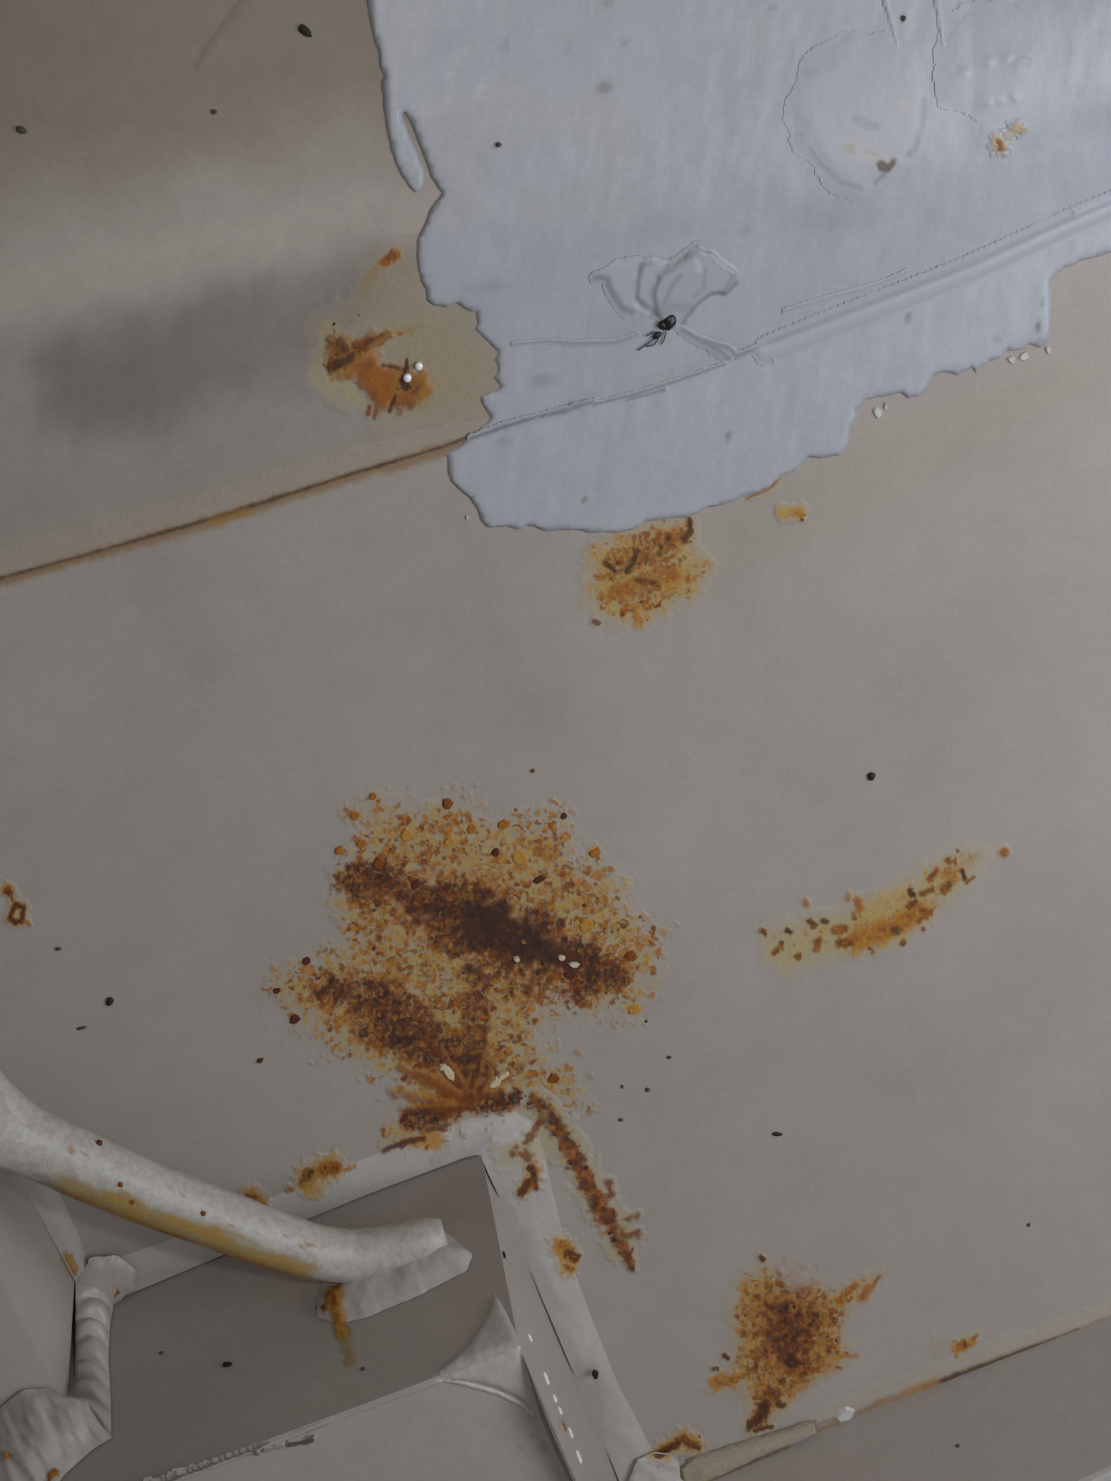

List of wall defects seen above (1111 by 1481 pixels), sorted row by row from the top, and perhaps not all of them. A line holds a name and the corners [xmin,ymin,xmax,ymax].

corrosion [0,236,500,594]
corrosion [574,508,724,638]
corrosion [0,878,36,931]
corrosion [748,832,1014,986]
corrosion [236,774,682,1283]
corrosion [321,1284,351,1340]
corrosion [701,1245,1111,1441]